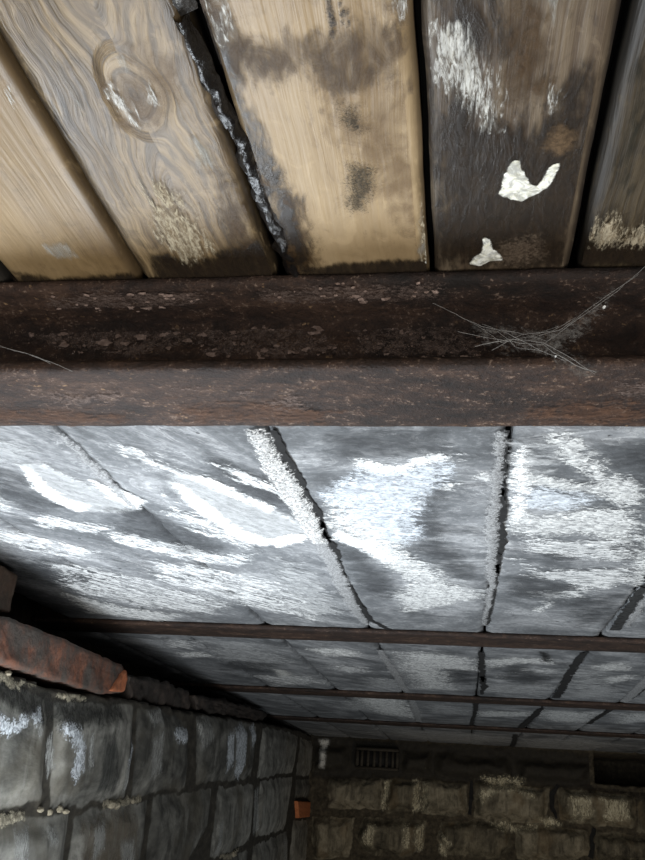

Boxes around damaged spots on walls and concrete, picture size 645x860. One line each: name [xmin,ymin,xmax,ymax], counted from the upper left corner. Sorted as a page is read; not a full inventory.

damp [200,0,427,275]
damp [429,0,595,270]
rust [48,292,201,312]
rust [28,325,350,359]
rust [261,282,442,304]
rust [351,327,481,357]
damp [0,441,343,621]
crack [270,430,391,630]
damp [320,431,485,612]
crack [486,430,510,625]
crack [610,576,645,631]
crack [510,653,587,747]